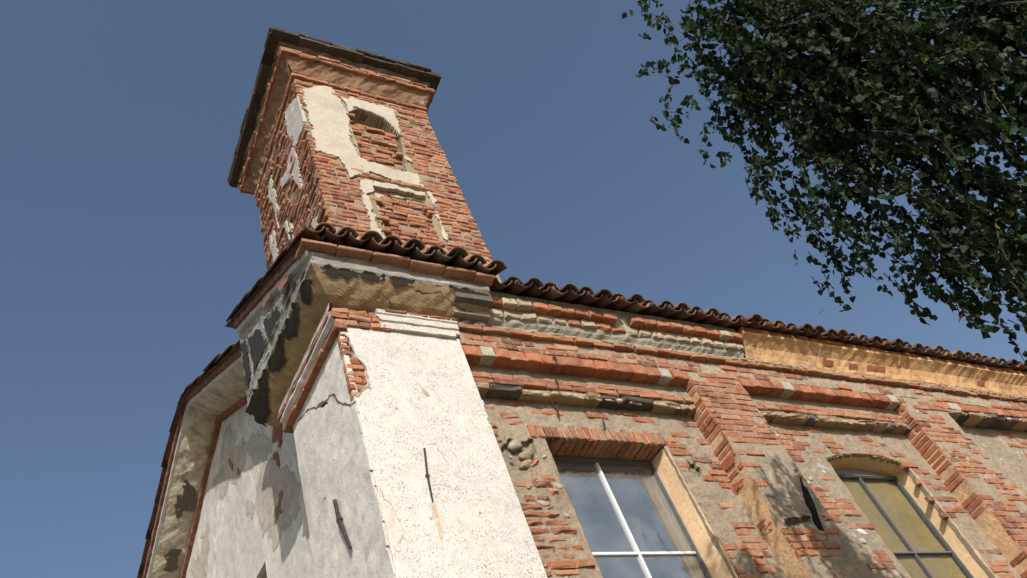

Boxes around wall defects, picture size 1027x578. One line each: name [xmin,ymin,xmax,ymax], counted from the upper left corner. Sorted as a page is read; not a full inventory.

spalling [336,333,372,401]
crack [297,393,356,422]
peeling [212,422,300,551]